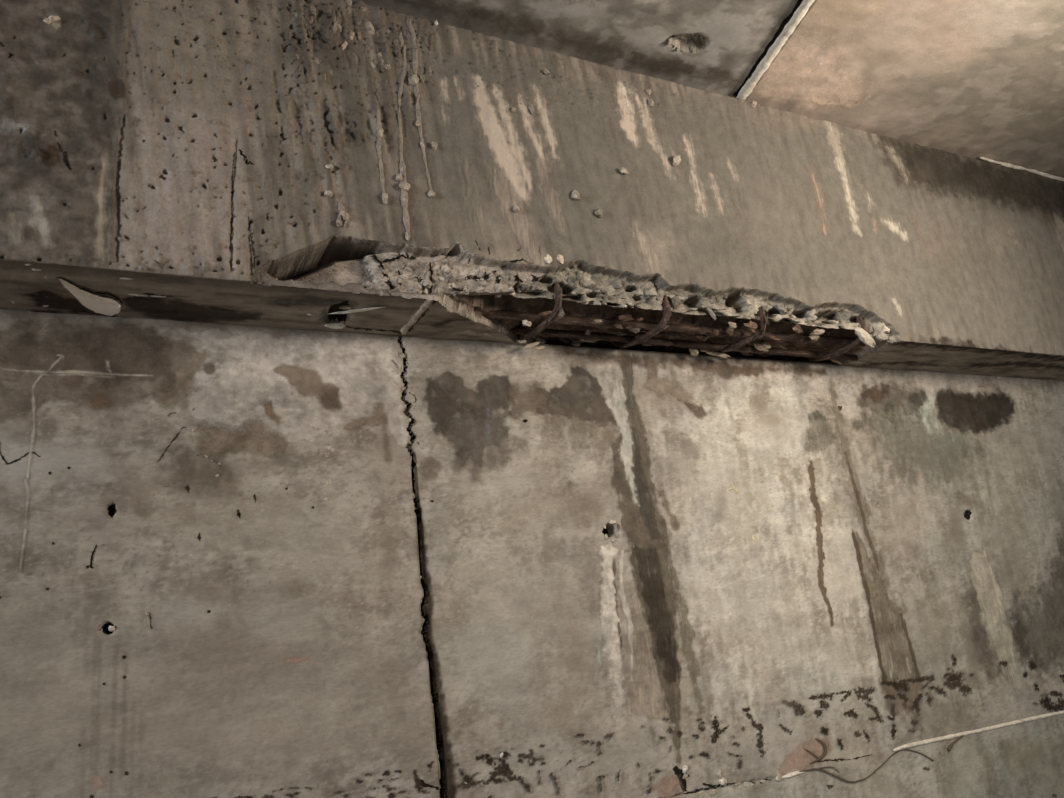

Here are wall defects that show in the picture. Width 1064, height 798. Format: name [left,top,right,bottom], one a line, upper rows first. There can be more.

efflorescence [441,75,565,266]
efflorescence [617,82,722,213]
spalling [250,235,1064,370]
water stain [0,291,409,484]
water stain [853,384,1014,478]
crack [346,301,467,798]
water stain [423,355,766,768]
rust [515,282,921,729]
water stain [357,745,560,798]
crack [660,765,783,798]
crack [817,755,870,763]
water stain [778,655,973,750]